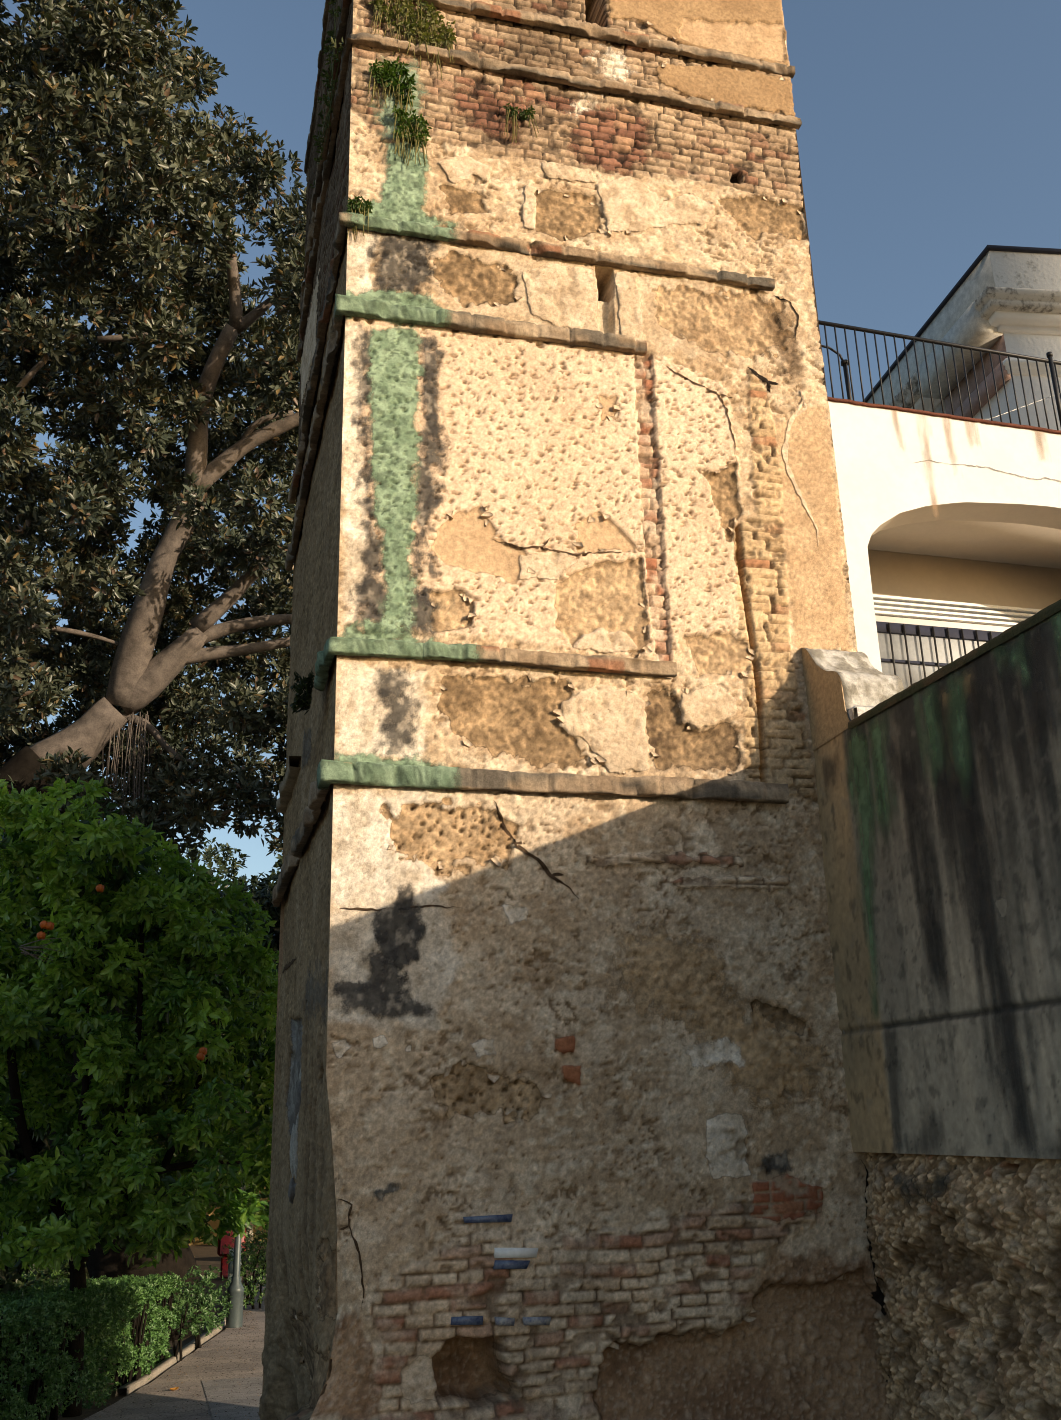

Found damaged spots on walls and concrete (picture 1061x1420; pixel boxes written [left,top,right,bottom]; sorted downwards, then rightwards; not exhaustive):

water stain [376,62,425,138]
peeling [609,0,795,116]
water stain [367,231,442,295]
water stain [350,332,448,639]
flaking render [702,463,741,542]
peeling [429,506,653,658]
flaking render [437,633,755,776]
water stain [305,884,433,1019]
flaking render [379,798,520,877]
crack [494,801,579,899]
water stain [938,673,1036,1151]
crack [861,1160,887,1316]